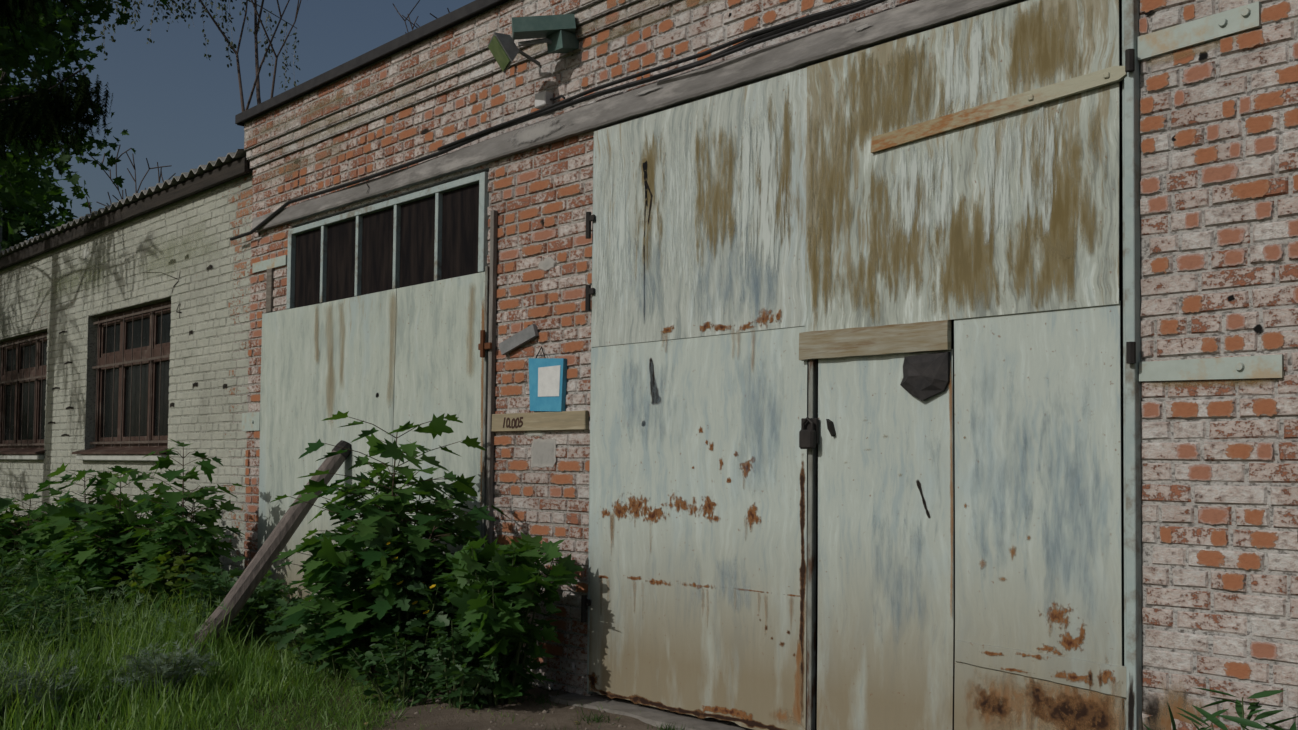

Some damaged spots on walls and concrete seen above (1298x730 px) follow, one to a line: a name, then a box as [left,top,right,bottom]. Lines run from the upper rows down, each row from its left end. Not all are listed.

damp [939,21,990,110]
peeling [1139,0,1298,220]
damp [737,114,788,277]
damp [893,141,952,237]
damp [984,106,1054,240]
rust [700,310,781,332]
rust [699,427,755,483]
peeling [1142,400,1234,418]
rust [588,461,806,730]
peeling [1196,507,1278,591]
rust [967,603,1122,730]
peeling [1223,642,1278,679]